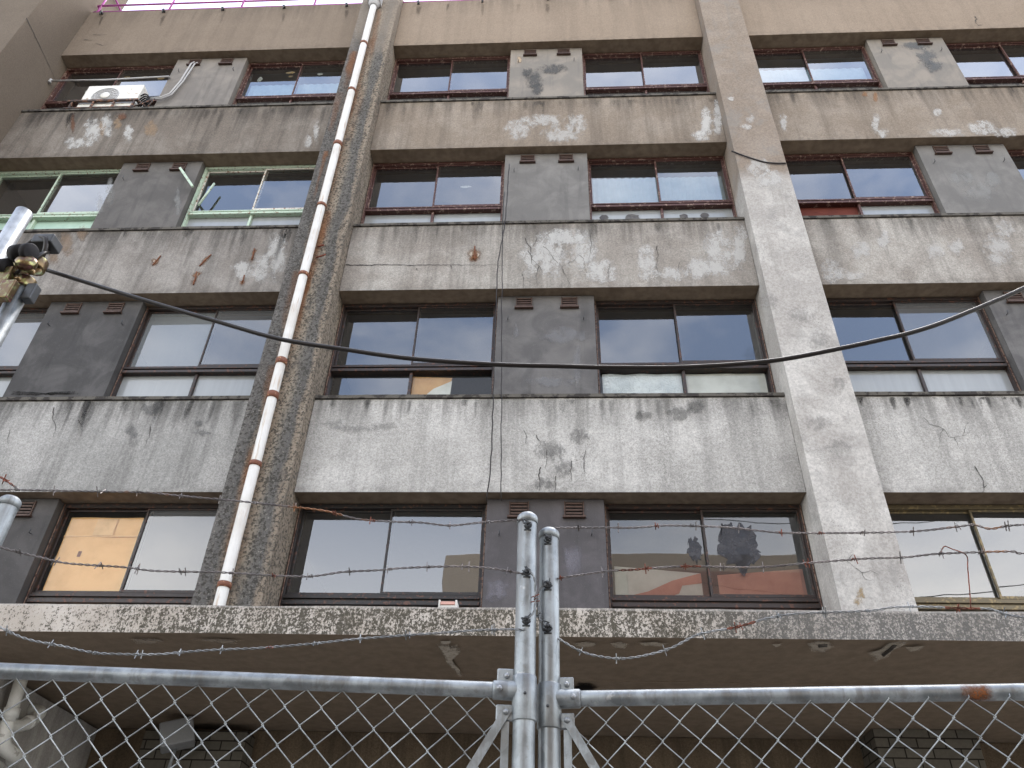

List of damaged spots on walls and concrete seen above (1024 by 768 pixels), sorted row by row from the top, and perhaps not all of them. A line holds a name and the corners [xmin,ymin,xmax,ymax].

water stain [523,64,564,94]
water stain [68,118,112,149]
water stain [693,98,733,140]
water stain [749,160,780,186]
crack [346,263,459,271]
crack [489,230,610,288]
water stain [638,228,747,280]
peeling [438,641,461,675]
spalling [870,642,923,660]